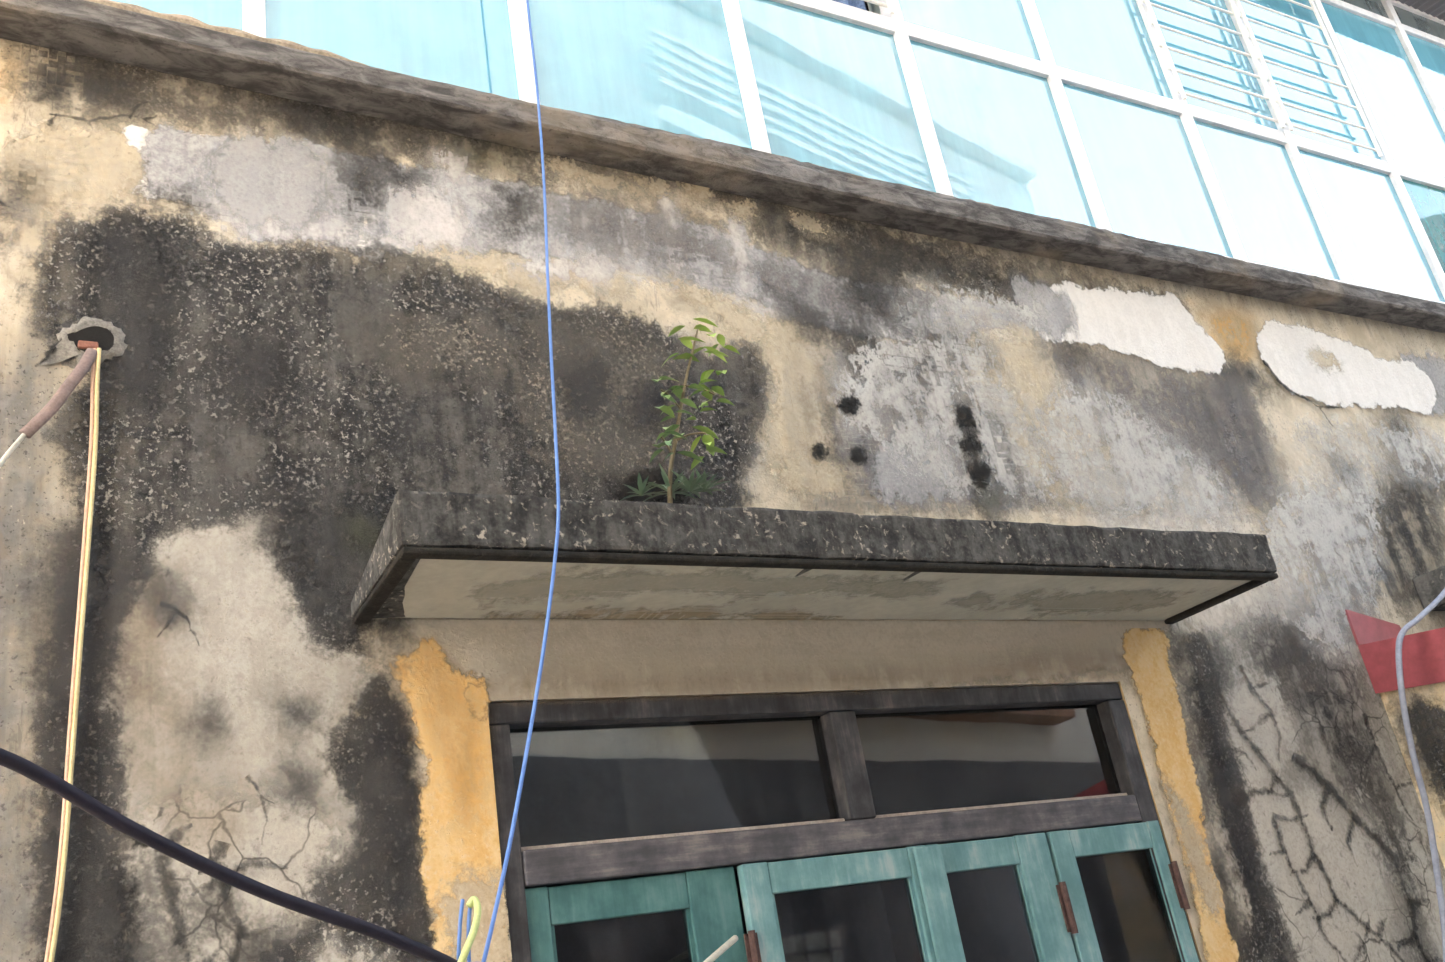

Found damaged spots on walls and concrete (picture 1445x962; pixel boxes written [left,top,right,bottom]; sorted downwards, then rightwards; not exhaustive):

water stain [21,44,561,189]
peeling [4,122,1238,518]
water stain [685,192,1164,305]
peeling [1256,319,1445,415]
crack [132,807,276,962]
crack [245,775,274,821]
water stain [21,203,768,962]
water stain [1166,631,1299,962]
flaking render [1210,426,1445,962]
crack [1219,665,1442,962]
water stain [1248,412,1445,962]